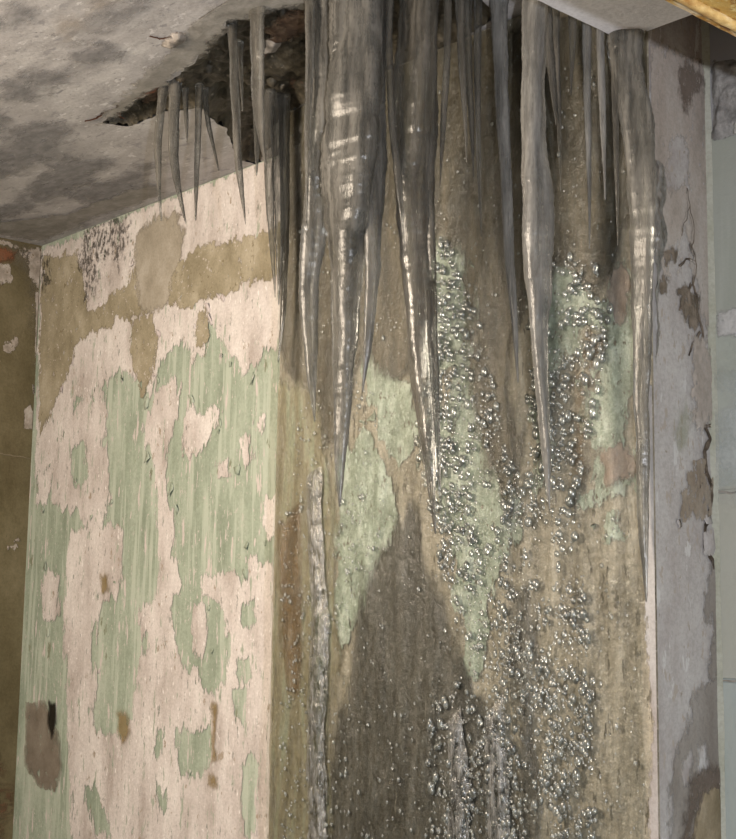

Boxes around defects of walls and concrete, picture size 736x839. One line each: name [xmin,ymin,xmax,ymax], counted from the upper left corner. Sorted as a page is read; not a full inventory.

damp [96,0,311,125]
spalling [386,0,491,68]
damp [279,24,527,502]
damp [544,16,647,294]
crack [678,188,704,356]
peeling [650,40,736,436]
peeling [0,5,330,839]
peeling [676,458,714,529]
crack [698,414,736,570]
damp [328,502,538,839]
spalling [692,787,721,839]